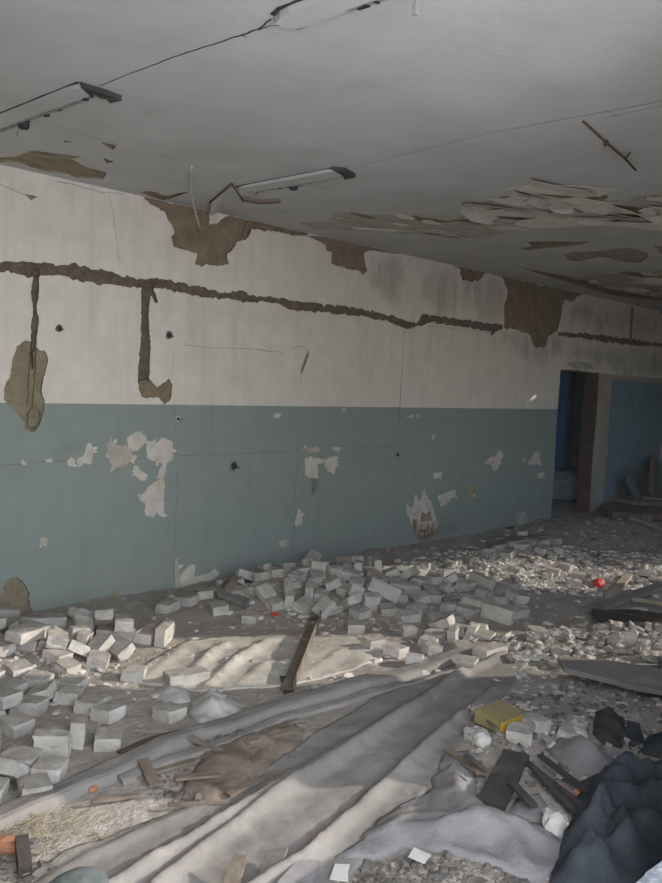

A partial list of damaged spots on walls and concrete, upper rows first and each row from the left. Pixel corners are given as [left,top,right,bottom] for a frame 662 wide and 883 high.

crack [98,19,278,87]
spalling [0,142,117,179]
spalling [141,180,662,274]
spalling [452,265,662,348]
spalling [4,340,48,432]
peeling [67,431,177,518]
peeling [303,445,341,479]
peeling [406,489,457,535]
spalling [0,577,33,615]